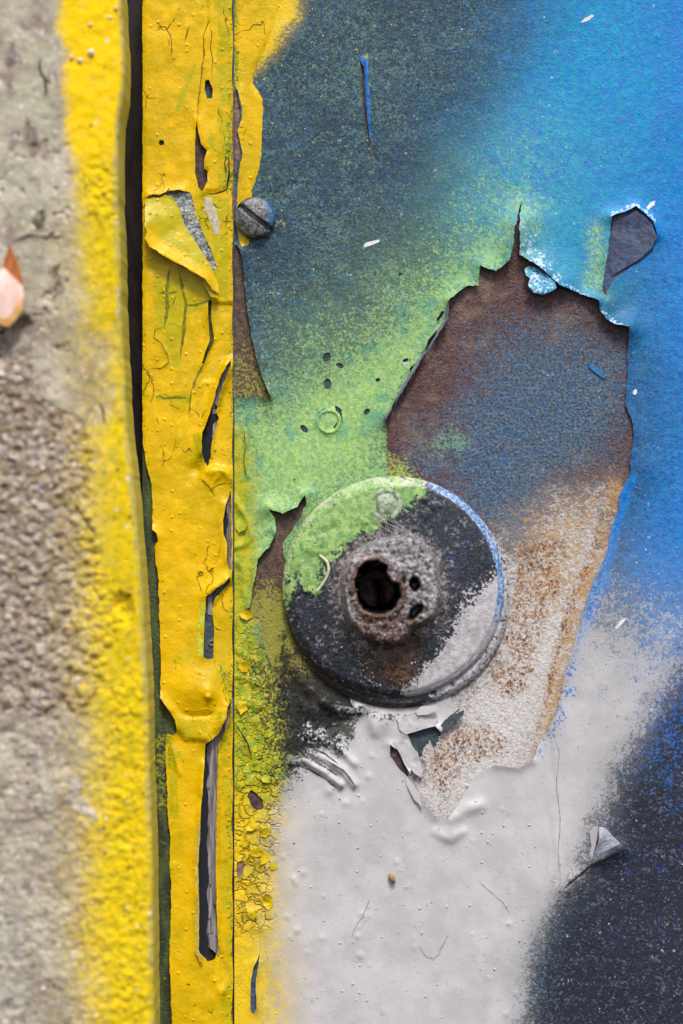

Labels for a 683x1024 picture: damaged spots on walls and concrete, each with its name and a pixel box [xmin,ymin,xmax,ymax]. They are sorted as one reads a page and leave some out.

crack [155,20,213,117]
crack [146,188,182,198]
peeling [144,122,220,364]
crack [208,156,230,194]
crack [148,269,210,413]
peeling [197,492,248,660]
peeling [239,495,353,707]
peeling [386,202,657,819]
peeling [194,699,248,962]
peeling [236,760,277,878]
peeling [248,894,273,920]
peeling [565,826,620,888]